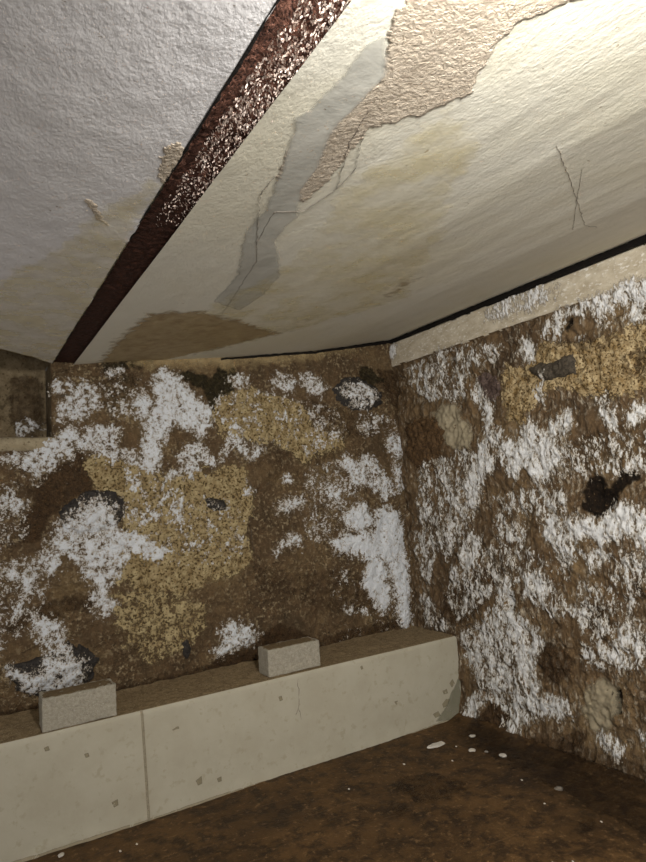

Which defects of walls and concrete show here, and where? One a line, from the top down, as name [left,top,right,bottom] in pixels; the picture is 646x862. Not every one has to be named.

corrosion [54,0,351,363]
water stain [215,37,385,310]
peeling [275,0,575,202]